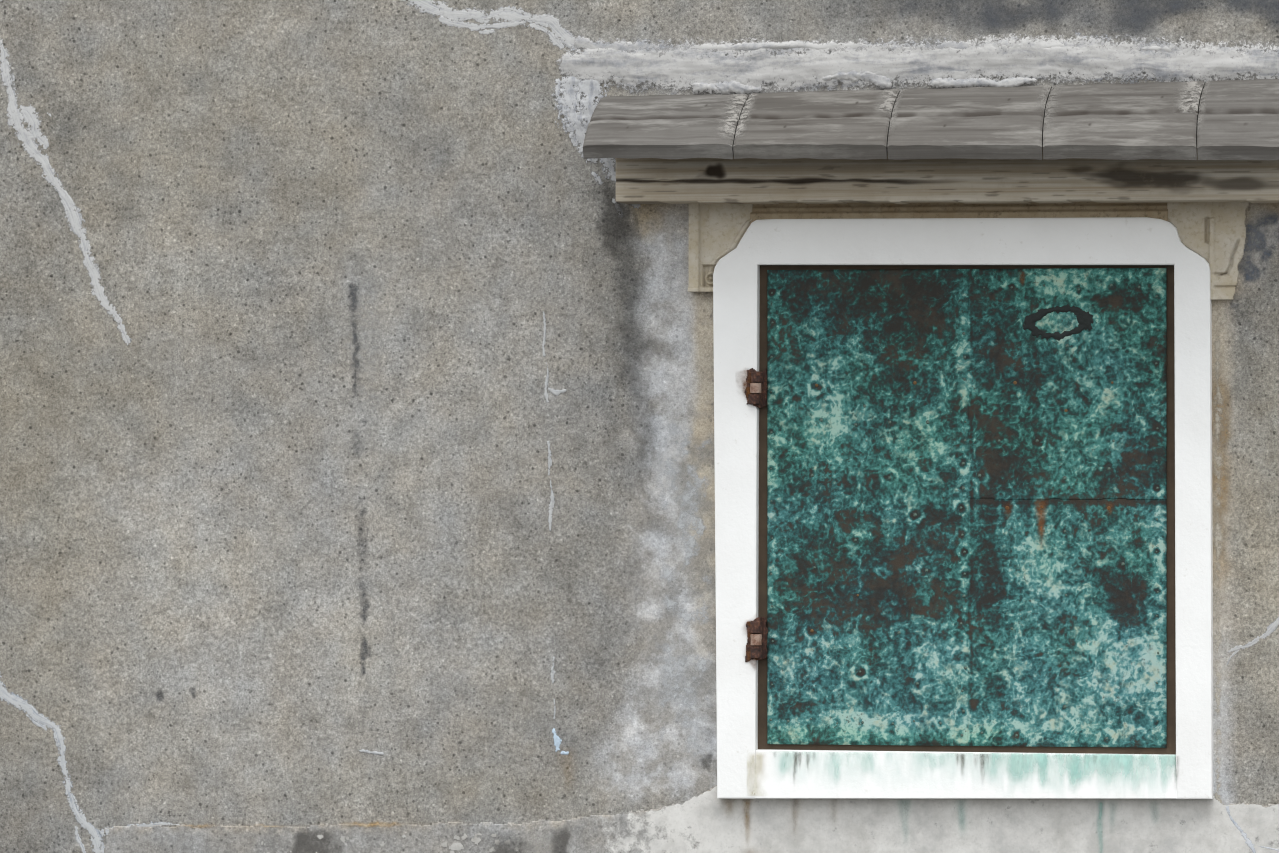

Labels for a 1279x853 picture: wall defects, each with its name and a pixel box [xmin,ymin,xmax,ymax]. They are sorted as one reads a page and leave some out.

crack [401,0,584,52]
crack [0,39,132,345]
crack [349,286,359,389]
crack [542,312,567,402]
crack [547,441,555,531]
crack [361,594,370,674]
crack [1227,617,1279,665]
crack [549,657,557,719]
crack [0,671,185,853]
water stain [1011,753,1176,782]
water stain [295,832,340,853]
water stain [551,832,569,853]